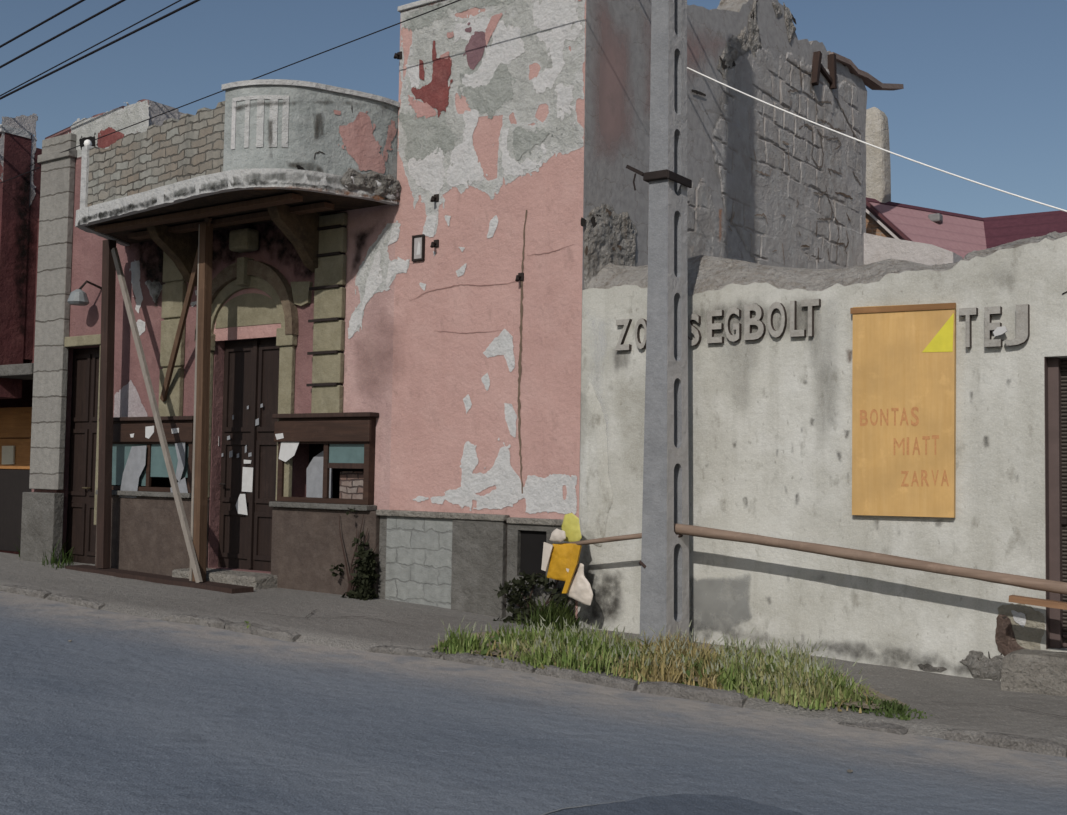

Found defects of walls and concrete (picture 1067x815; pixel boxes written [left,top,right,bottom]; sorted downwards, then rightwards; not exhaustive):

spalling [68,100,150,158]
peeling [333,0,586,238]
spalling [687,0,863,269]
peeling [348,220,410,339]
spalling [581,203,637,288]
peeling [483,329,515,372]
peeling [413,403,577,515]